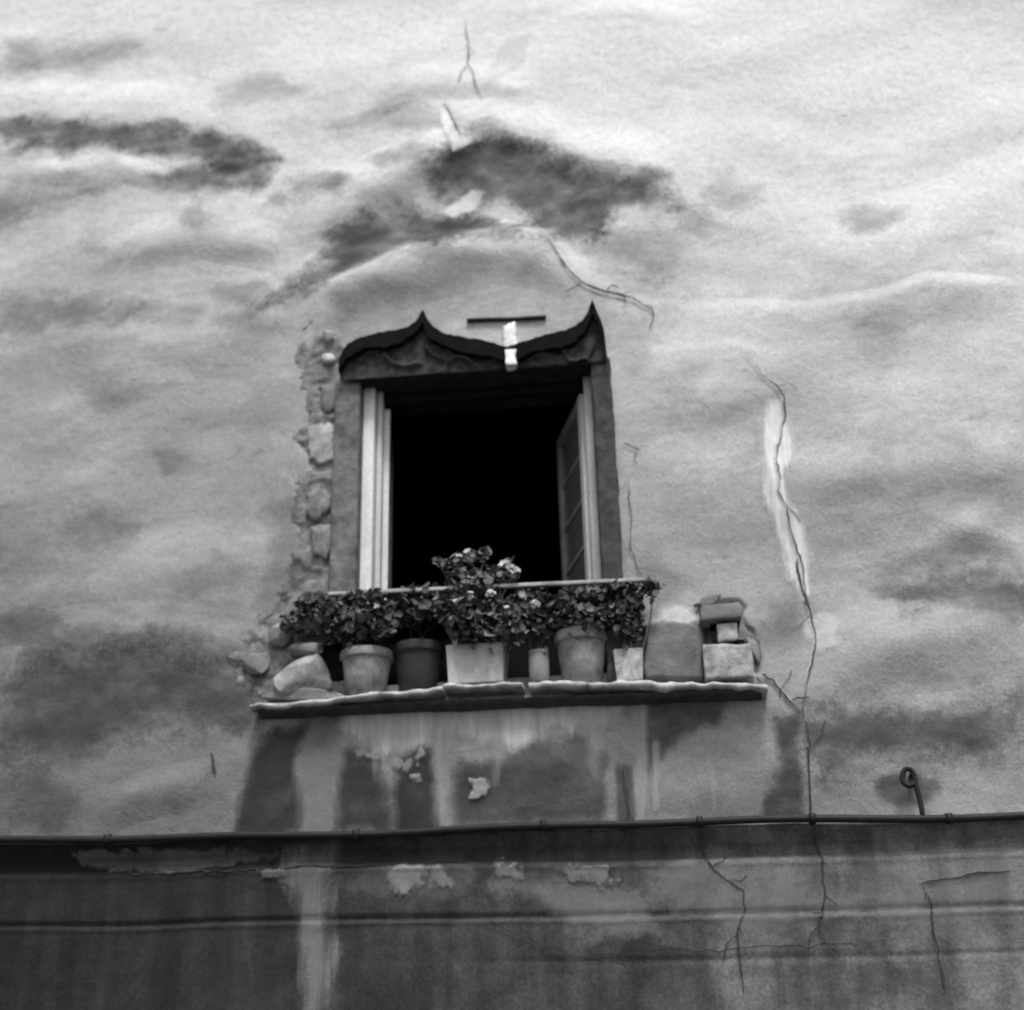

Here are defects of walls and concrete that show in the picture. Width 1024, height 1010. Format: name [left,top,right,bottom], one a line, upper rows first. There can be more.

crack [444,22,481,135]
damp [0,116,281,187]
damp [277,110,661,297]
crack [548,238,654,327]
flaking render [229,320,354,705]
crack [489,354,892,995]
damp [236,726,305,832]
damp [335,692,624,830]
flaking render [469,778,490,799]
flaking render [73,846,286,878]
flaking render [387,864,453,895]
crack [921,871,1011,994]